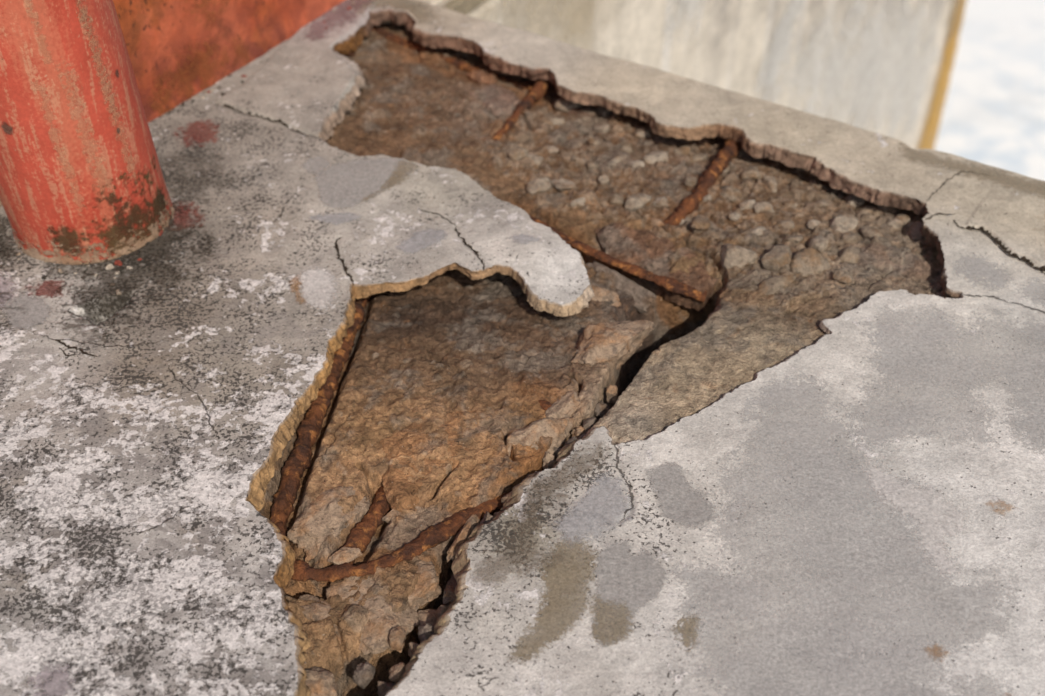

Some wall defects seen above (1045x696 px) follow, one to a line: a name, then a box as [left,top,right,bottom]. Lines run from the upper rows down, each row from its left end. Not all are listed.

rust [371,26,561,141]
crack [335,238,354,287]
crack [418,208,485,270]
rust [528,214,707,302]
crack [926,171,1045,274]
spalling [284,23,944,696]
spalling [259,410,307,519]
rust [269,296,370,536]
rust [291,486,512,582]
leakage [510,476,763,661]
leakage [646,462,733,548]
leakage [712,312,1011,696]